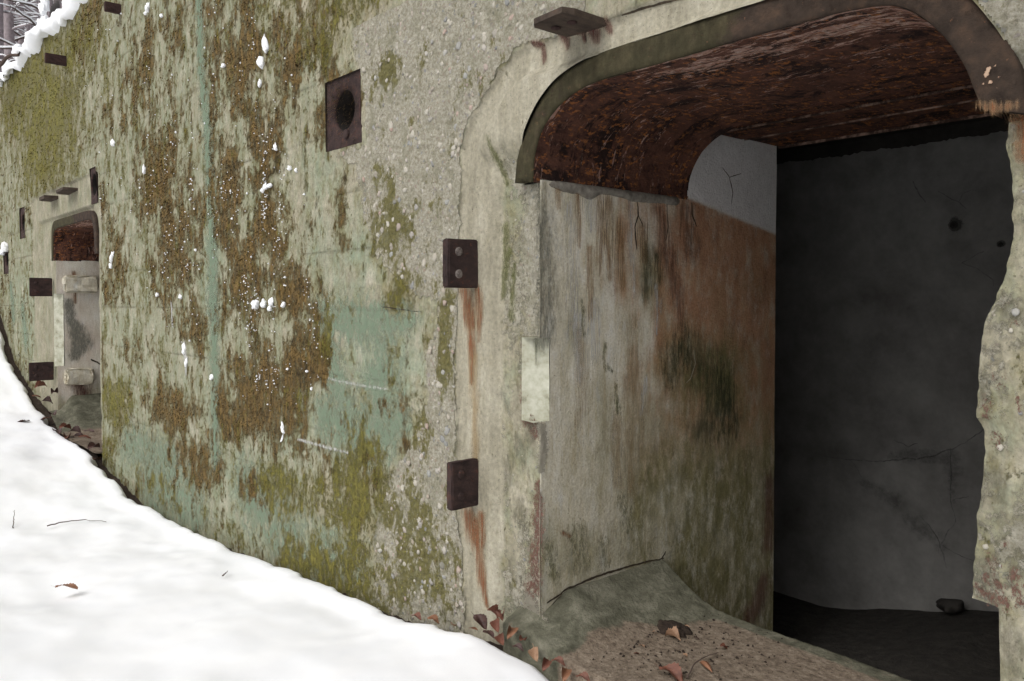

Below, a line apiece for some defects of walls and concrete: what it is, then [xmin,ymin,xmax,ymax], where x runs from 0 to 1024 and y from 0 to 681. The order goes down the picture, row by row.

water stain [194,0,221,468]
corrosion [459,286,483,385]
spalling [979,286,1024,418]
corrosion [465,507,488,608]
spalling [974,473,1024,611]